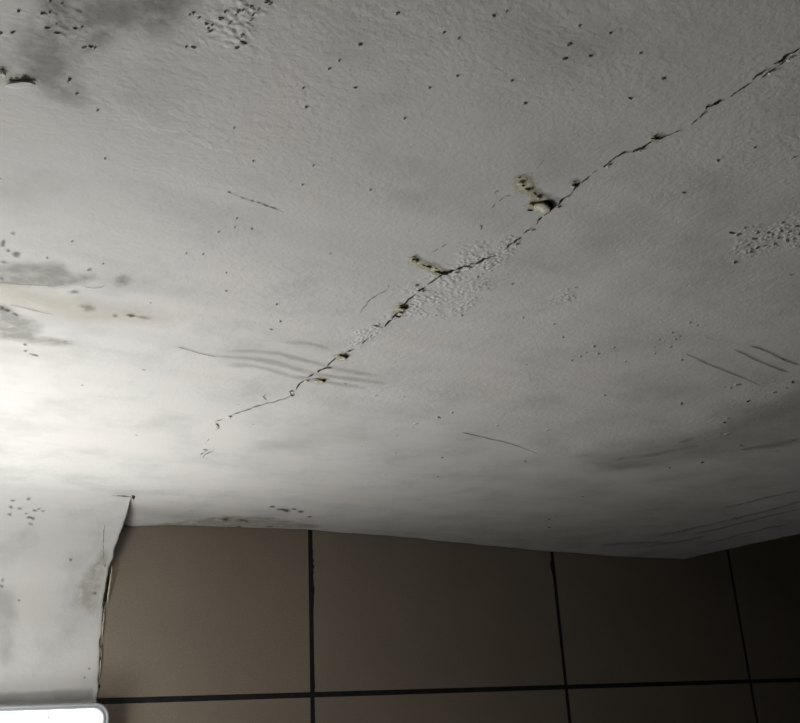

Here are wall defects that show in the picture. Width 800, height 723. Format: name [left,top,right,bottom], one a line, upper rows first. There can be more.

spalling [515,176,553,213]
spalling [409,256,448,276]
crack [200,49,799,457]